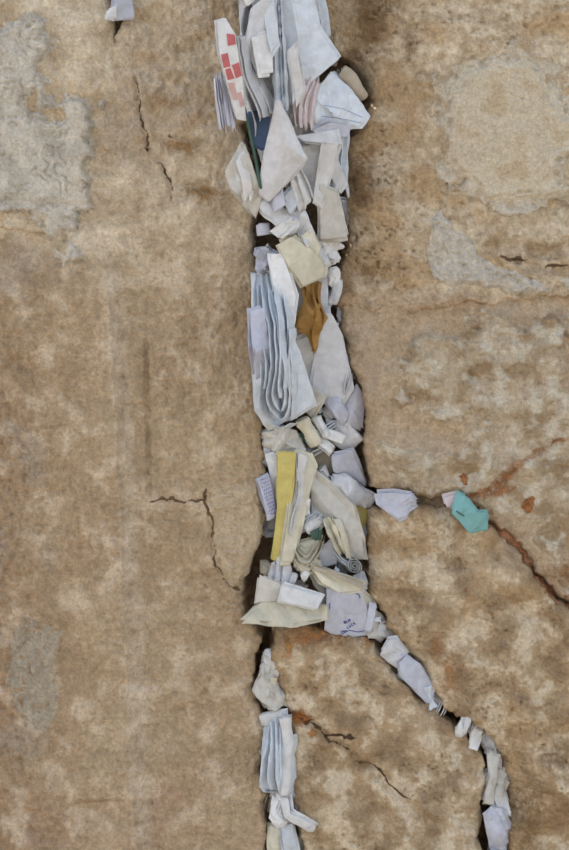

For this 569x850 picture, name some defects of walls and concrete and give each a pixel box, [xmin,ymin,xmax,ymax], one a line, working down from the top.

peeling [0,11,105,270]
crack [136,82,188,198]
crack [477,508,569,608]